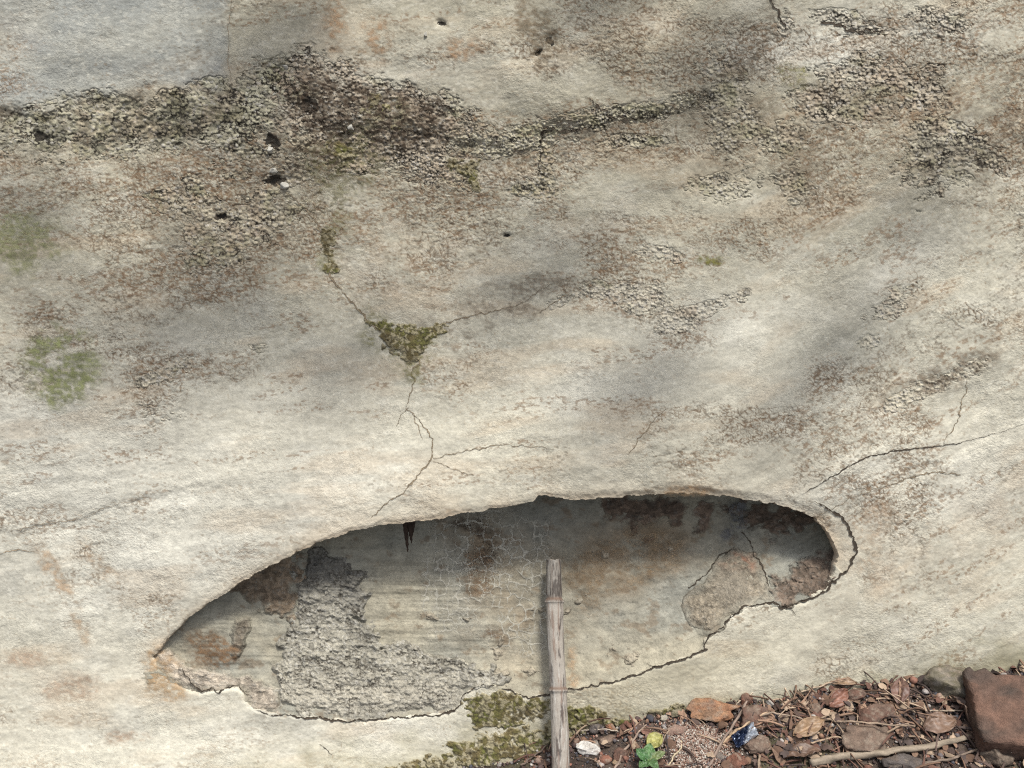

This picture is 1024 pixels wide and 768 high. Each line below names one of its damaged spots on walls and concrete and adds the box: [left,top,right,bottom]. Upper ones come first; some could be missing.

leakage [289,77,443,170]
crack [439,283,566,325]
crack [375,359,554,515]
spalling [141,492,836,724]
crack [182,383,1020,754]